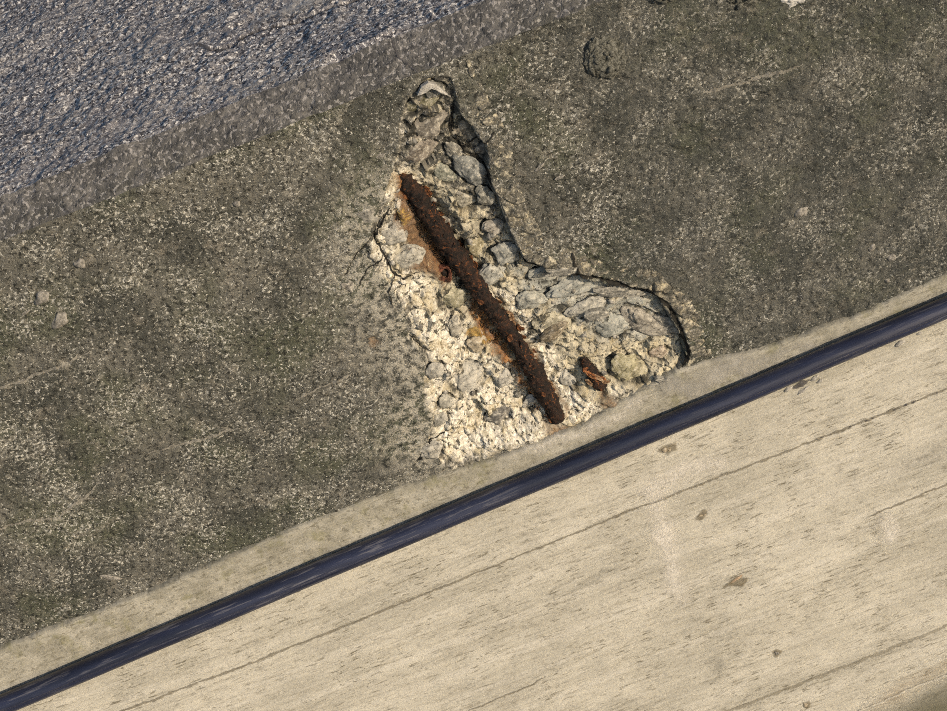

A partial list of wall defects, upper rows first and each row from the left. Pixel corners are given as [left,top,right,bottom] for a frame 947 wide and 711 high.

crack [343,201,420,306]
corrosion [394,173,568,434]
spalling [357,59,711,470]
corrosion [580,356,616,407]